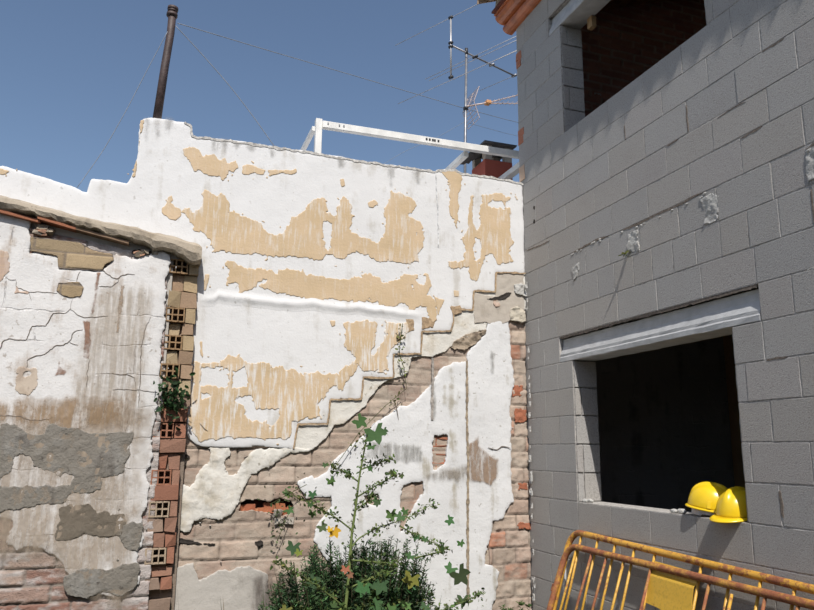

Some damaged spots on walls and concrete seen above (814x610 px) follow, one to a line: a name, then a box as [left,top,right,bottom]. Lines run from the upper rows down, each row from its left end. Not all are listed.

peeling [183,147,297,181]
peeling [0,250,10,281]
flaking render [57,282,84,298]
flaking render [30,237,114,271]
peeling [162,179,444,323]
peeling [442,171,518,281]
crack [0,308,102,366]
crack [114,323,151,406]
leakage [0,399,141,576]
flaking render [177,319,474,610]
flaking render [485,321,532,610]